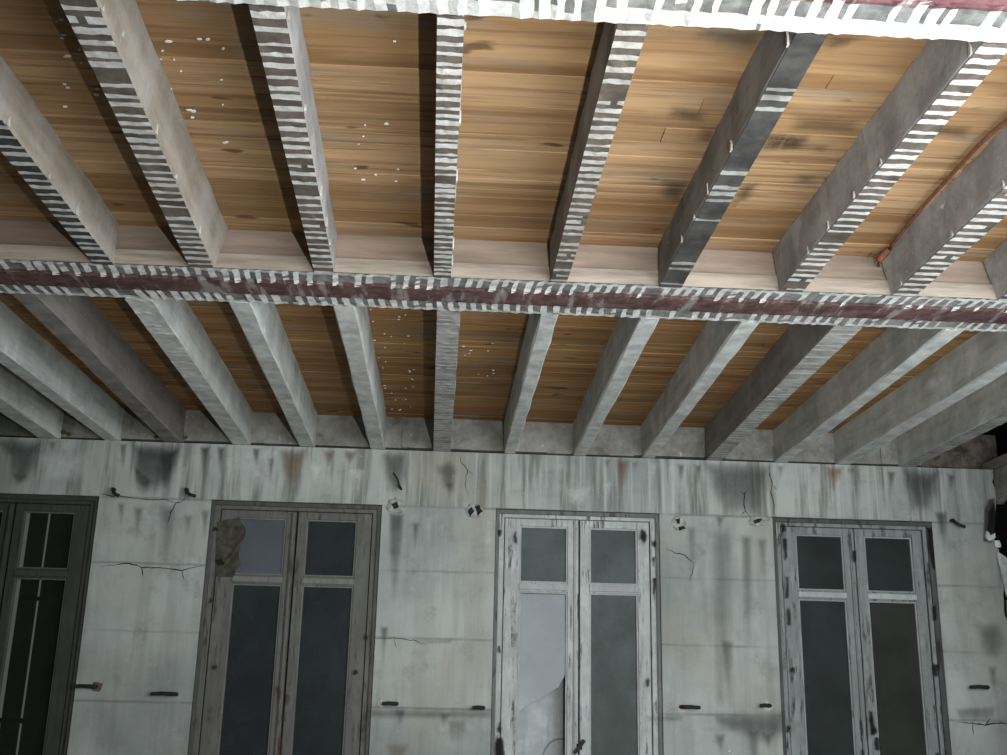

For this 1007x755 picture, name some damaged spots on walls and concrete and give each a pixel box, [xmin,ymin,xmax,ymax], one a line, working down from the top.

damp [138,449,175,480]
crack [100,493,183,521]
crack [98,563,203,578]
spalling [984,499,1007,615]